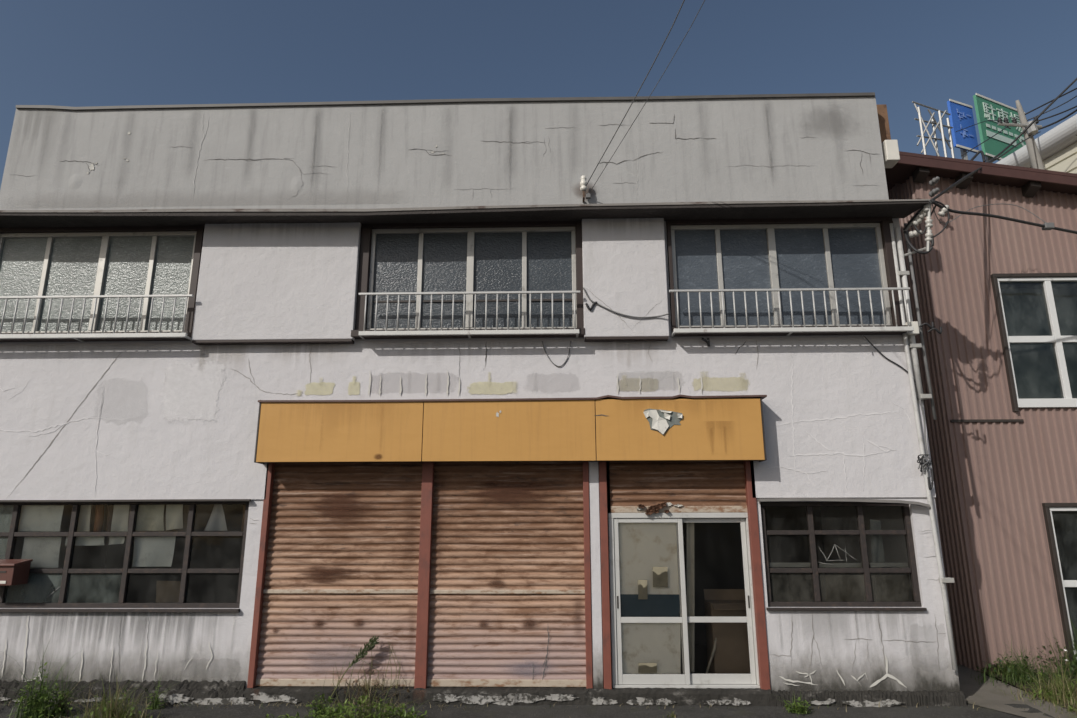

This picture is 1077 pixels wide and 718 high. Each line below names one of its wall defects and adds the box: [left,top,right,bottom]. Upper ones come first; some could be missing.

crack [601,115,716,183]
peeling [618,375,660,392]
peeling [692,371,749,392]
crack [12,350,123,494]
rust [317,494,369,525]
rust [638,502,669,515]
rust [304,566,349,582]
crack [776,615,822,672]
crack [845,615,945,678]
spalling [157,691,299,705]
spalling [433,693,677,706]
spalling [704,698,751,706]